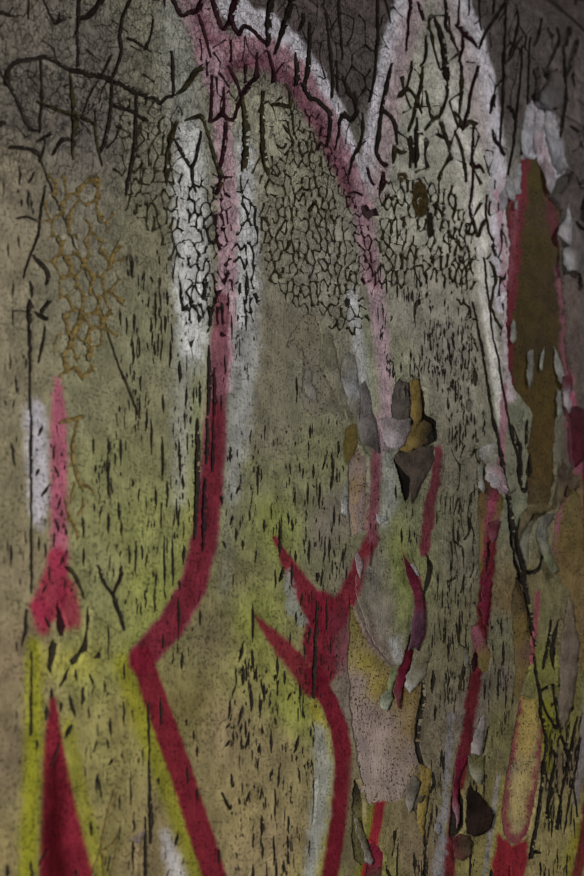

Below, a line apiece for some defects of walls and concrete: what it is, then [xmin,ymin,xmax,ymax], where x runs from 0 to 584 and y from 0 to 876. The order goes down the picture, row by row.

peeling [499,163,522,213]
peeling [557,203,584,275]
peeling [338,351,435,504]
peeling [526,346,584,468]
crack [41,345,227,669]
peeling [355,548,431,710]
crack [473,617,514,803]
crack [505,485,582,859]
peeling [405,764,442,838]
peeling [452,715,495,861]